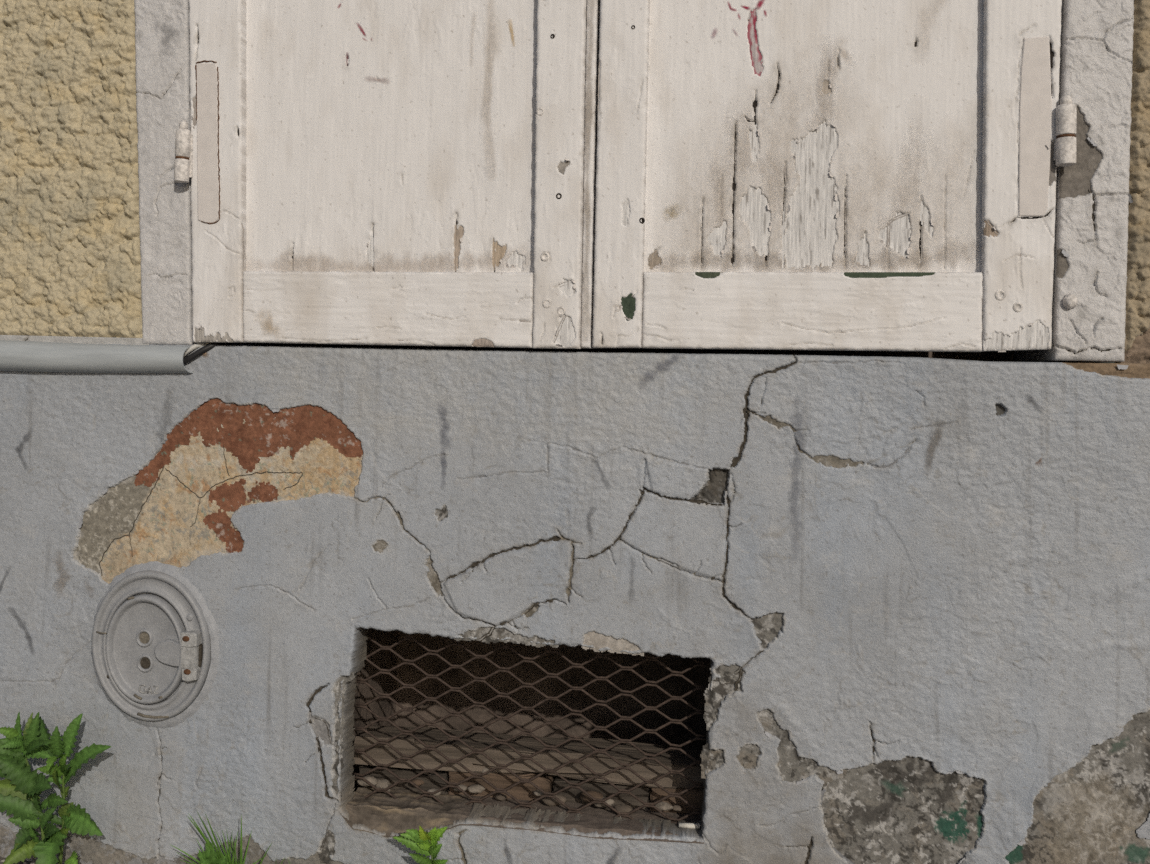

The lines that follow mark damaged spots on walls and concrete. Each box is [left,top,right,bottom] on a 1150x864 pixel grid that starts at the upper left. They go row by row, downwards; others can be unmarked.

peeling [707,120,935,278]
spalling [73,398,363,584]
crack [357,324,882,642]
crack [871,392,949,468]
crack [735,651,763,691]
peeling [55,826,200,864]
peeling [214,827,343,864]
crack [296,683,334,851]
crack [452,830,467,864]
crack [761,789,855,864]
spalling [700,664,985,864]
spalling [1005,710,1150,864]